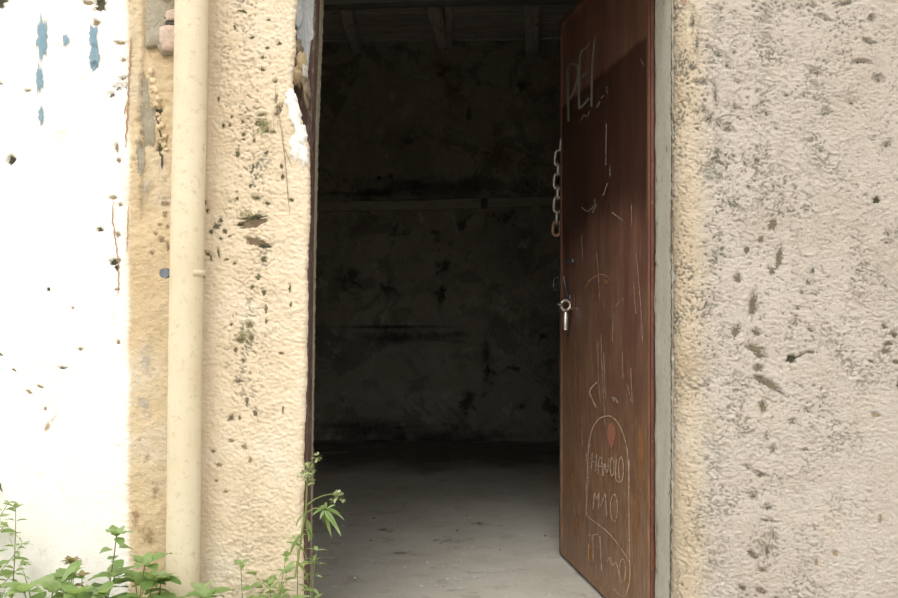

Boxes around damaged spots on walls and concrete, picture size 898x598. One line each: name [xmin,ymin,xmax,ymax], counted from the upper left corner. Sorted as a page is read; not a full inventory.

flaking render [145,0,174,56]
crack [155,116,163,168]